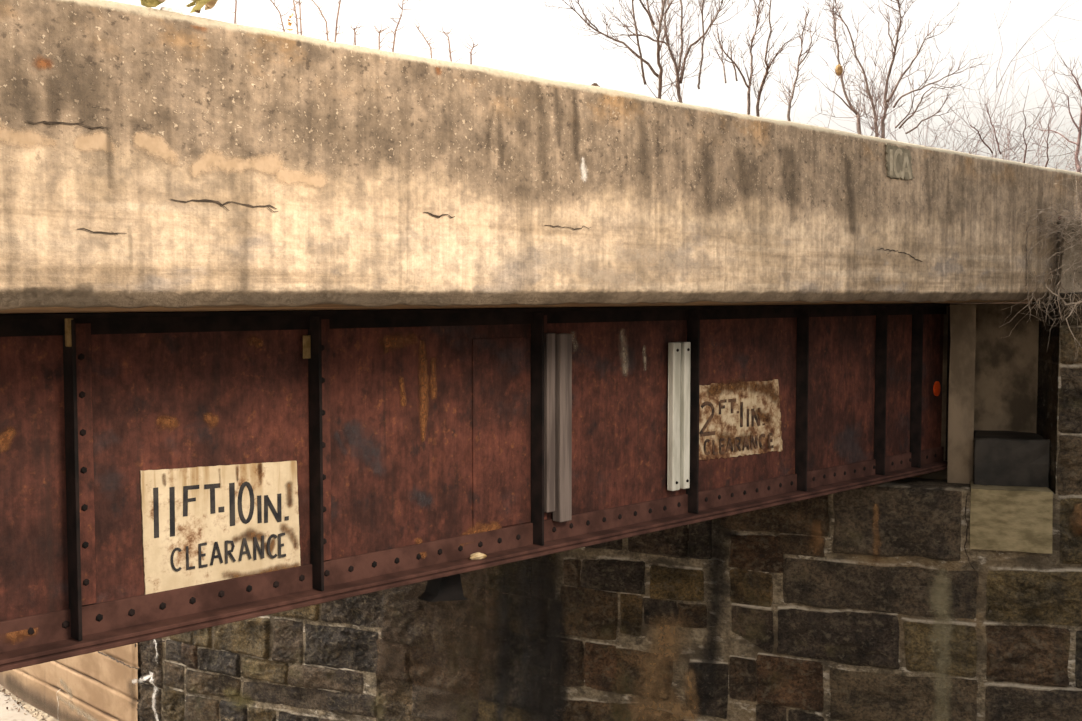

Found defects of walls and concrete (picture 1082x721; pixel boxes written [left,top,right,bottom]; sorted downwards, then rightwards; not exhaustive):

crack [171,199,279,212]
crack [79,227,127,235]
corrosion [384,335,436,440]
corrosion [708,381,778,403]
corrosion [0,429,14,450]
corrosion [233,525,297,555]
corrosion [224,563,299,578]
damp [477,555,566,721]